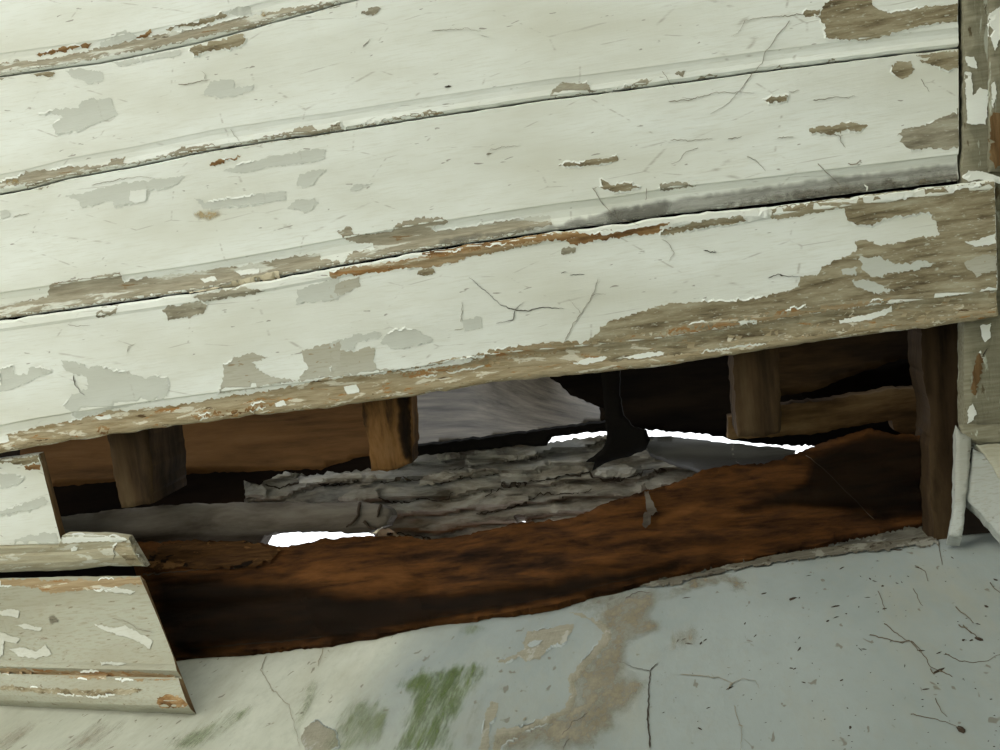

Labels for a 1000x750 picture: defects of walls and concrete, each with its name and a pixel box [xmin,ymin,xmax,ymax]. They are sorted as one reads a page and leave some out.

peeling [0,1,341,84]
peeling [802,0,958,43]
peeling [0,108,1000,489]
crack [470,271,598,340]
peeling [0,577,144,594]
peeling [0,667,176,699]
peeling [157,694,188,709]
peeling [478,612,612,750]
crack [623,662,656,747]